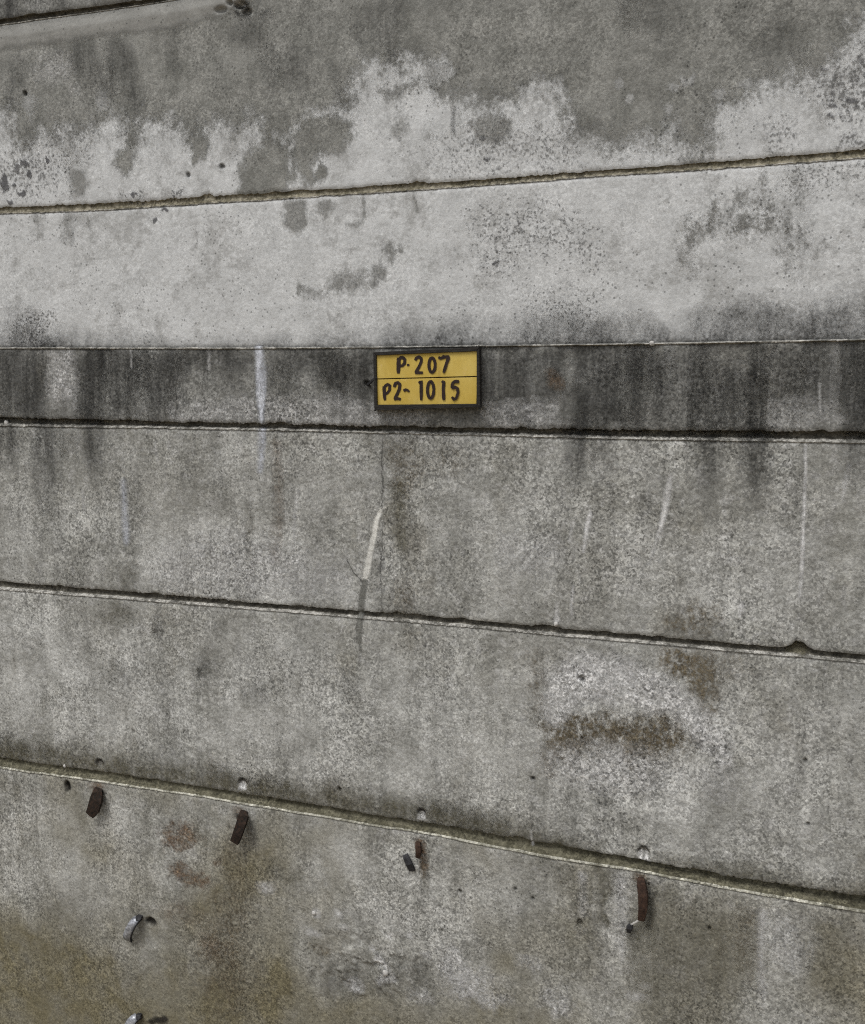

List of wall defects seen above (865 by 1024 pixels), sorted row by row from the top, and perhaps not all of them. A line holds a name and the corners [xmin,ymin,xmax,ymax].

damp [81,349,172,459]
damp [255,345,266,473]
damp [543,712,692,771]